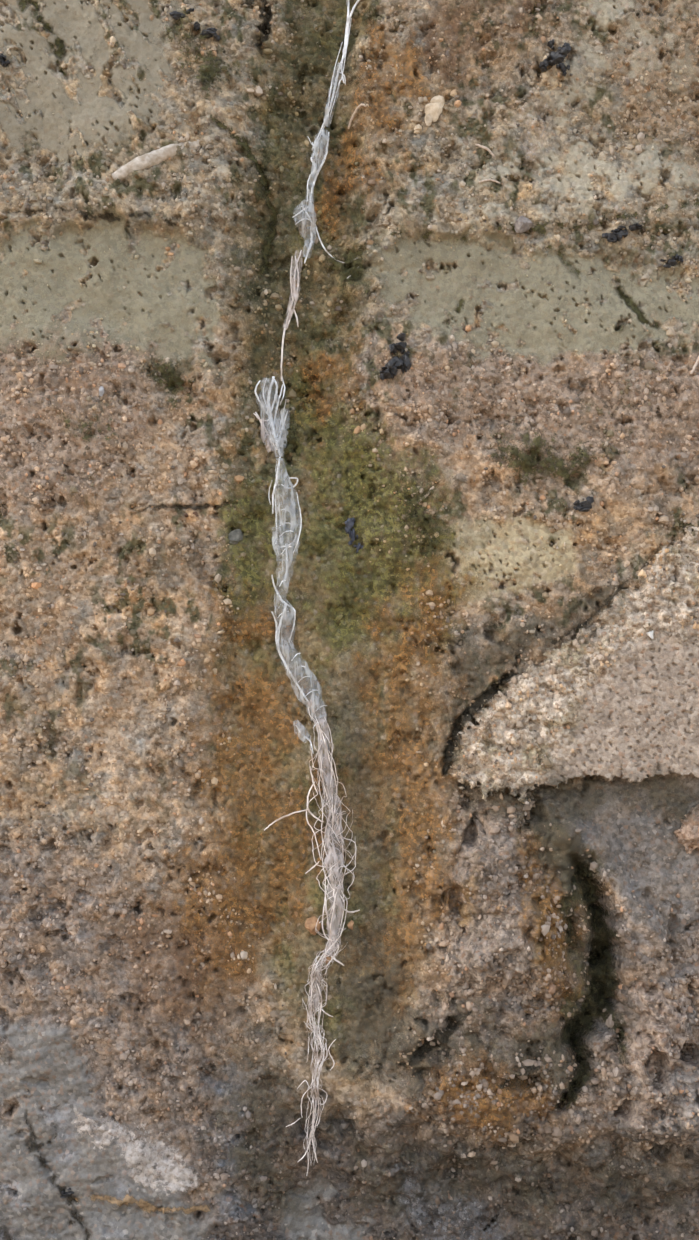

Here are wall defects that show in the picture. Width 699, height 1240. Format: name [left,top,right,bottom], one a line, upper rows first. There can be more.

rust [303,25,431,233]
damp [291,364,348,454]
damp [216,477,289,621]
rust [124,562,469,1040]
damp [335,838,581,1096]
damp [216,1057,306,1213]
damp [350,1131,577,1240]